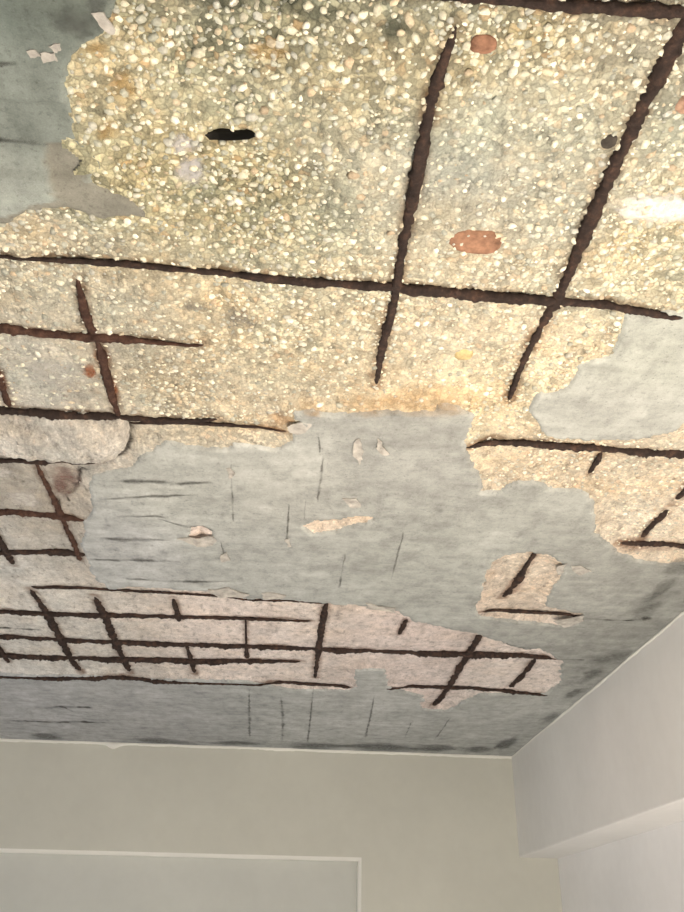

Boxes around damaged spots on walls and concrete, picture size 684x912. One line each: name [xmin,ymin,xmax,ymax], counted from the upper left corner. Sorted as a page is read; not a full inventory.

corrosion [0,0,684,400]
corrosion [0,279,286,432]
spalling [0,0,684,711]
corrosion [0,458,95,564]
corrosion [466,439,684,474]
corrosion [620,510,684,549]
corrosion [0,585,557,706]
corrosion [482,609,577,617]